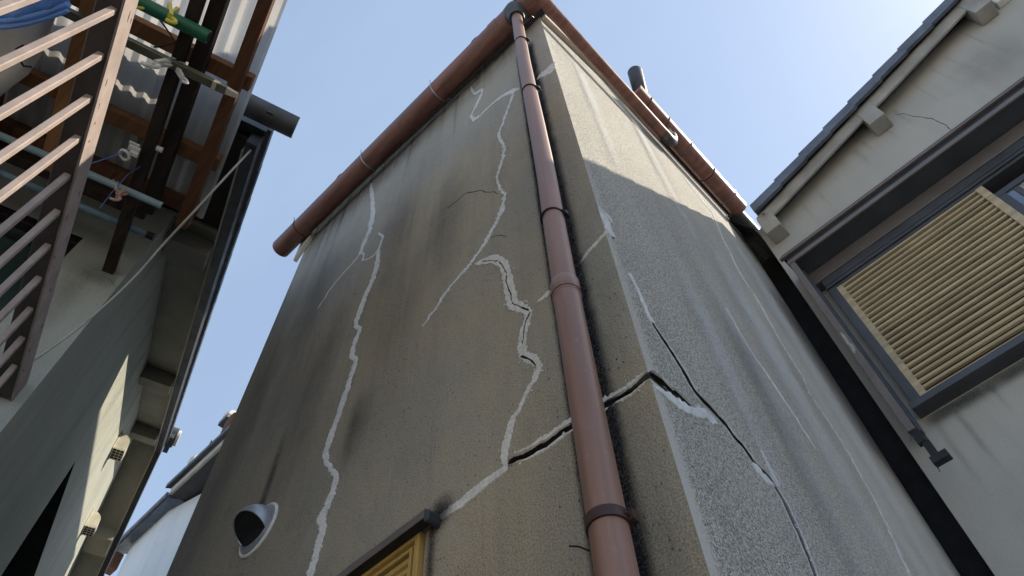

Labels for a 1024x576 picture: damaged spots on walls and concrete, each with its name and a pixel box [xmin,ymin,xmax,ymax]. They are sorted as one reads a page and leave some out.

crack [306,182,384,576]
crack [422,62,573,520]
crack [580,230,608,263]
crack [603,273,819,576]